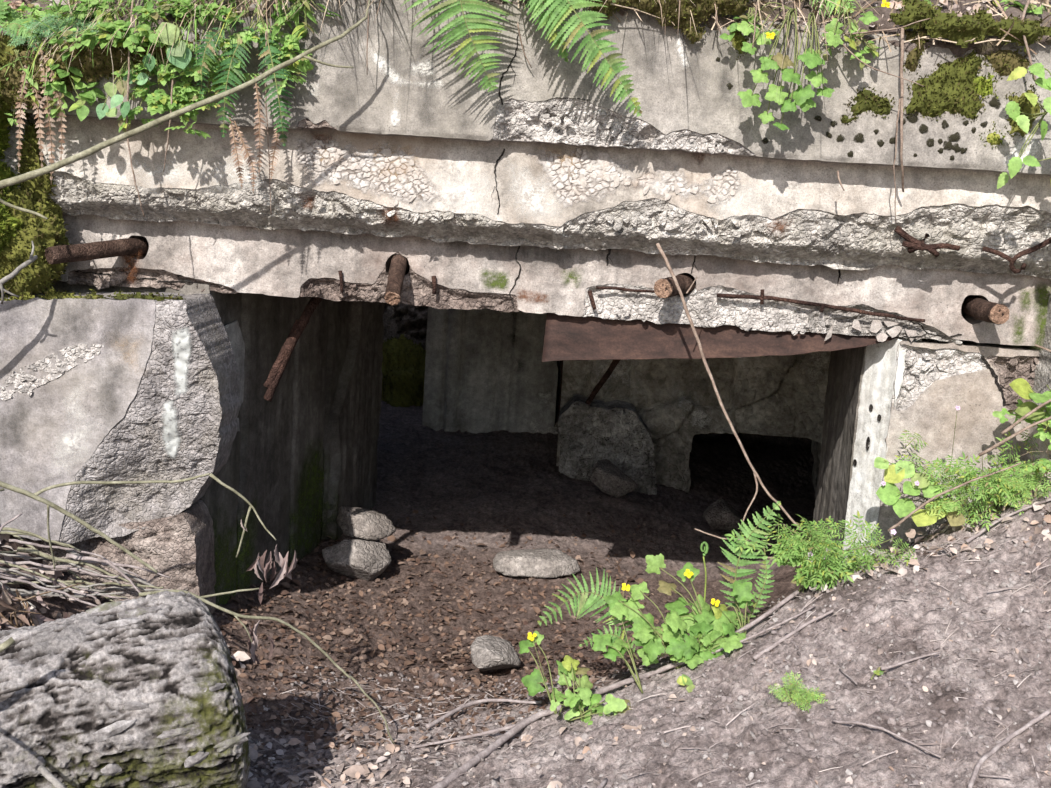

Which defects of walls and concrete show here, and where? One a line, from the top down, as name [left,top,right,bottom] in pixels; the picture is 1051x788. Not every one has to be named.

spalling [492,97,755,156]
damp [514,175,556,213]
spalling [300,252,520,312]
spalling [48,171,1051,281]
rust [717,289,925,322]
rust [894,226,960,257]
rust [982,237,1051,274]
spalling [582,284,1051,416]
spalling [59,267,245,544]